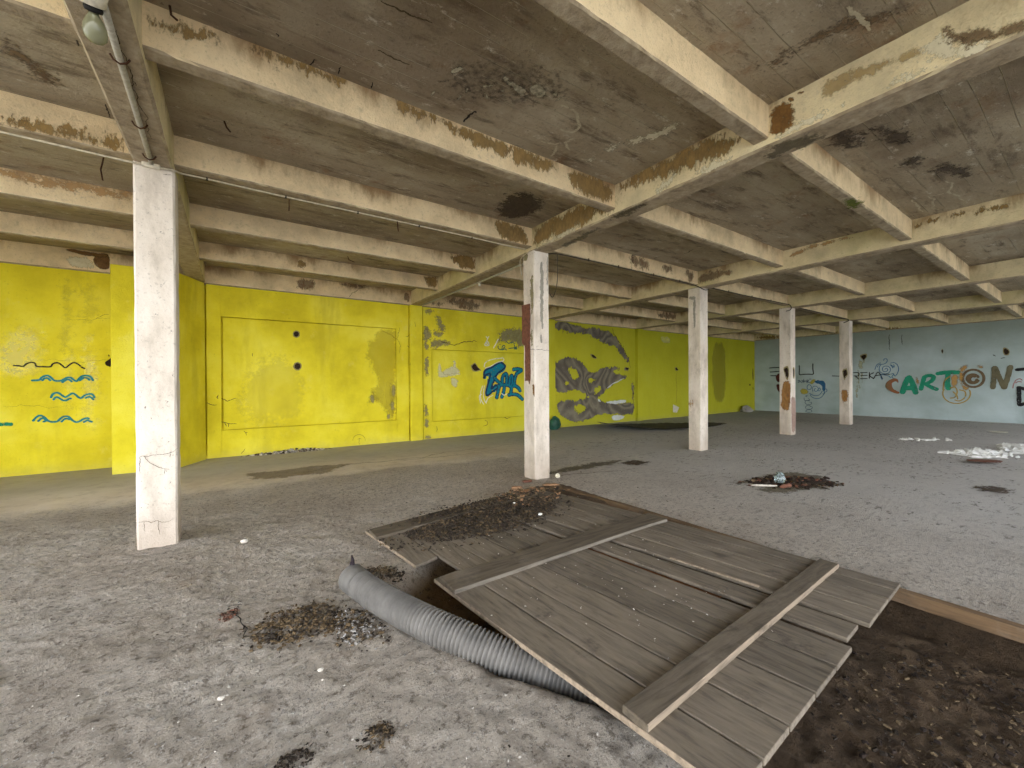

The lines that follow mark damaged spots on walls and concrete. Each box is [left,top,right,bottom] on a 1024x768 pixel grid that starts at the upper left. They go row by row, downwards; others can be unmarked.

rust [769,91,804,135]
damp [619,133,741,194]
damp [494,192,646,248]
rust [522,304,535,396]
rust [781,381,791,411]